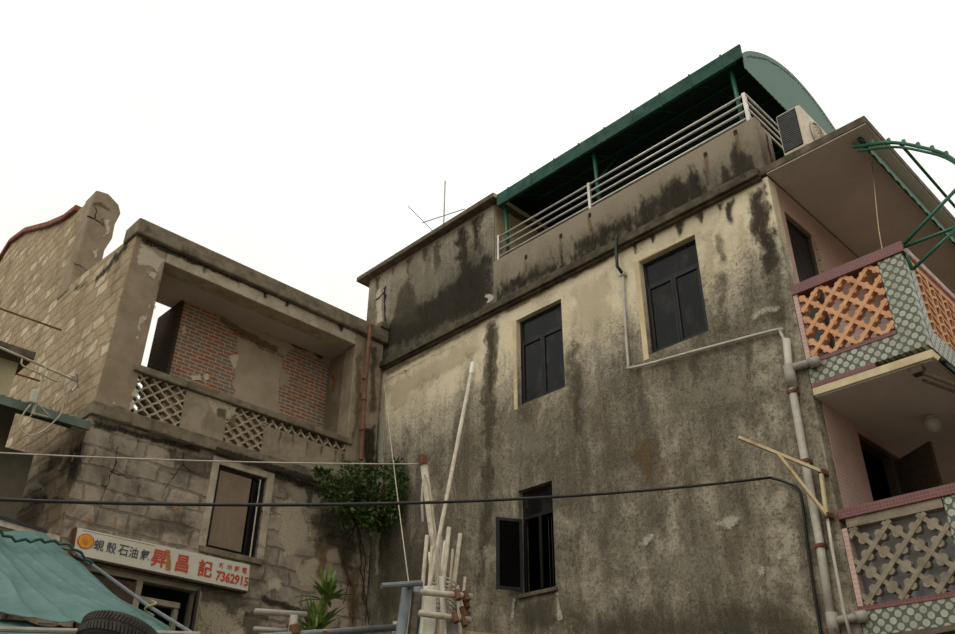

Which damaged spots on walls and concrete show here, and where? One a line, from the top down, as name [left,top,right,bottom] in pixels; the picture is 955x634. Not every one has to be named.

water stain [720,144,755,185]
peeling [137,242,165,285]
water stain [697,211,727,330]
water stain [717,184,785,321]
peeling [207,312,323,426]
water stain [352,165,708,621]
crack [98,446,130,512]
water stain [714,516,738,529]